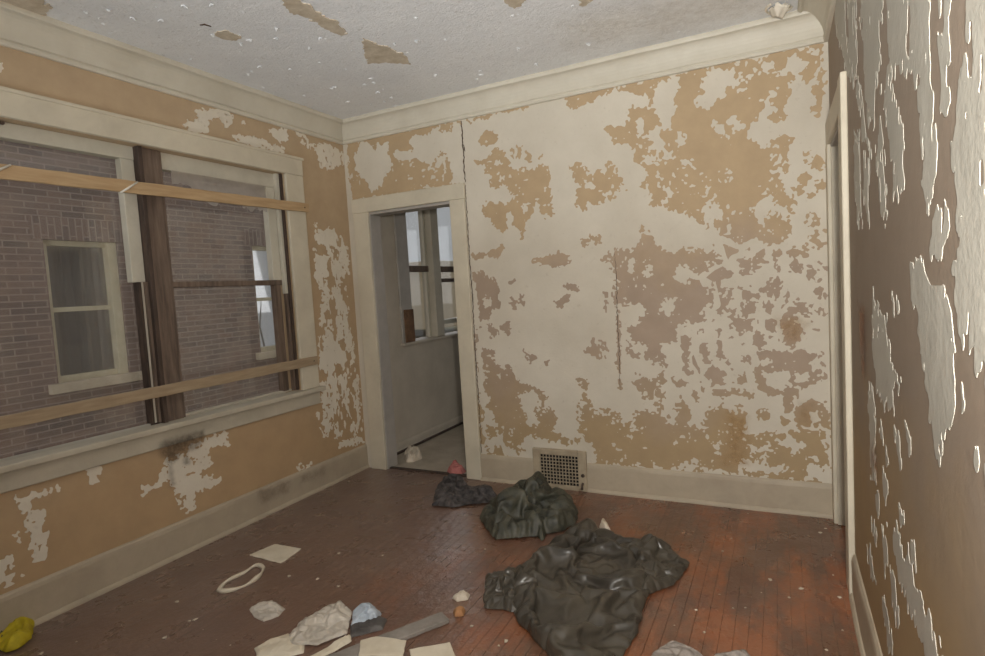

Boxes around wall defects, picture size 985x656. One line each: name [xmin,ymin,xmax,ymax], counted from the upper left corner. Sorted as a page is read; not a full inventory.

spalling [211,30,252,46]
spalling [282,0,348,50]
spalling [362,38,411,65]
spalling [504,0,526,17]
peeling [835,0,985,467]
peeling [182,44,832,483]
peeling [85,466,103,485]
peeling [140,430,231,514]
peeling [866,287,943,656]
peeling [974,446,985,476]
peeling [12,484,61,563]
peeling [0,554,25,588]